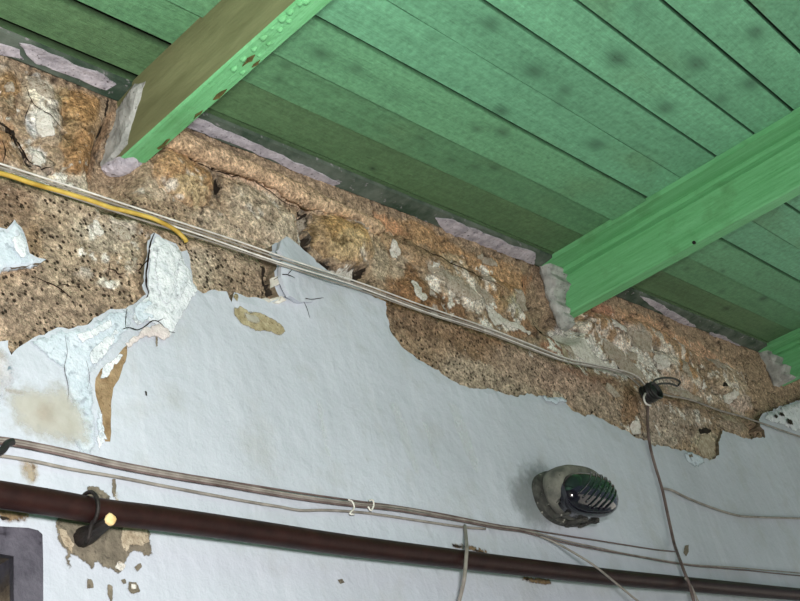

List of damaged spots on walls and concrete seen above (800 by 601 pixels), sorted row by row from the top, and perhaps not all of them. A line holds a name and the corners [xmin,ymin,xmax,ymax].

crack [1,89,62,170]
spalling [0,43,800,466]
spalling [87,486,110,499]
spalling [56,518,152,594]